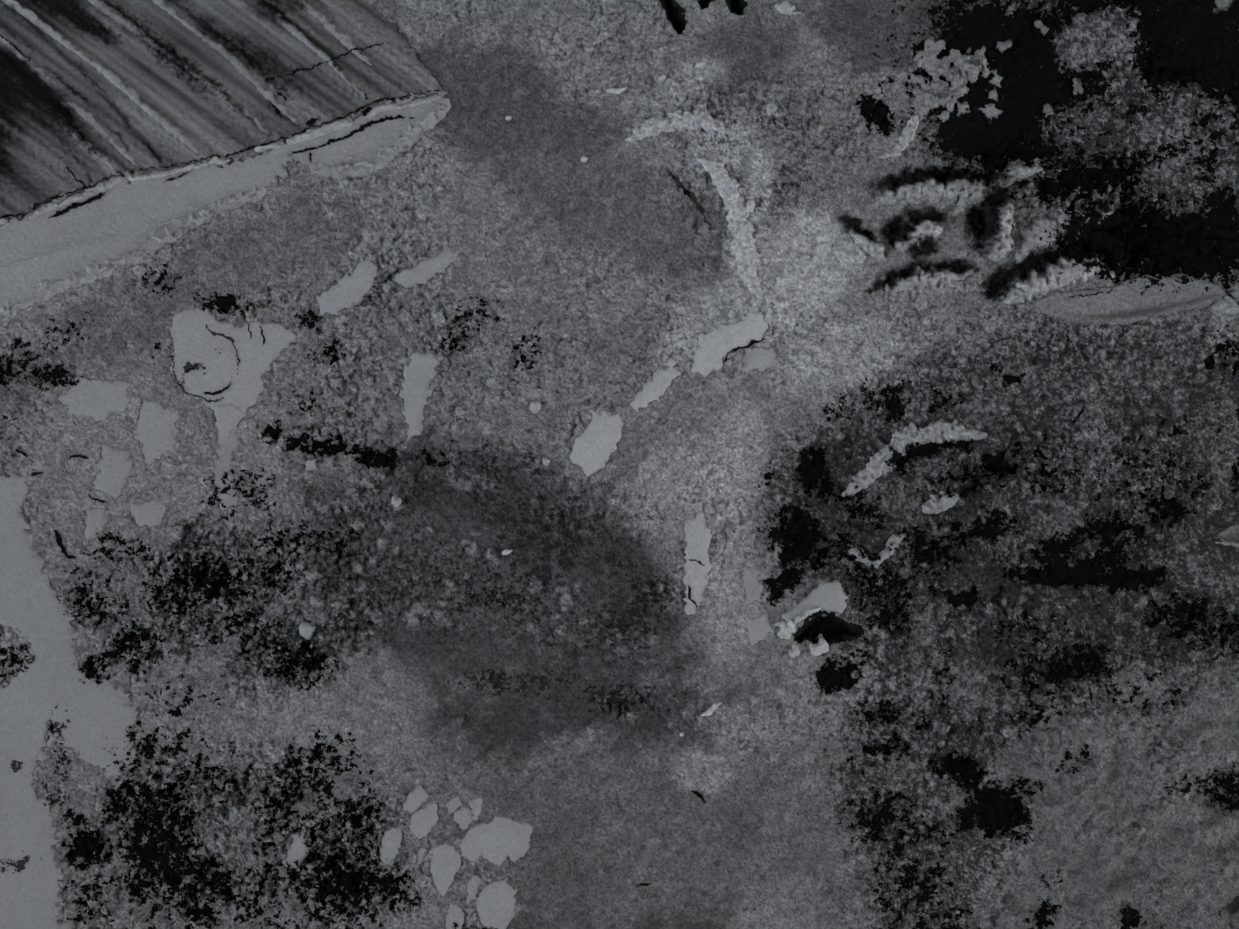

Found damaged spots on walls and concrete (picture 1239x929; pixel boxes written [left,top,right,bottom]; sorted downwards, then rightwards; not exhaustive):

peeling [0,0,451,220]
water stain [854,0,1239,305]
peeling [316,256,381,316]
peeling [569,310,779,477]
water stain [821,374,964,425]
water stain [985,361,1027,388]
water stain [1203,324,1239,377]
peeling [0,472,140,929]
peeling [683,512,712,615]
spalling [740,565,864,658]
water stain [757,408,1239,929]
peeling [379,785,534,929]